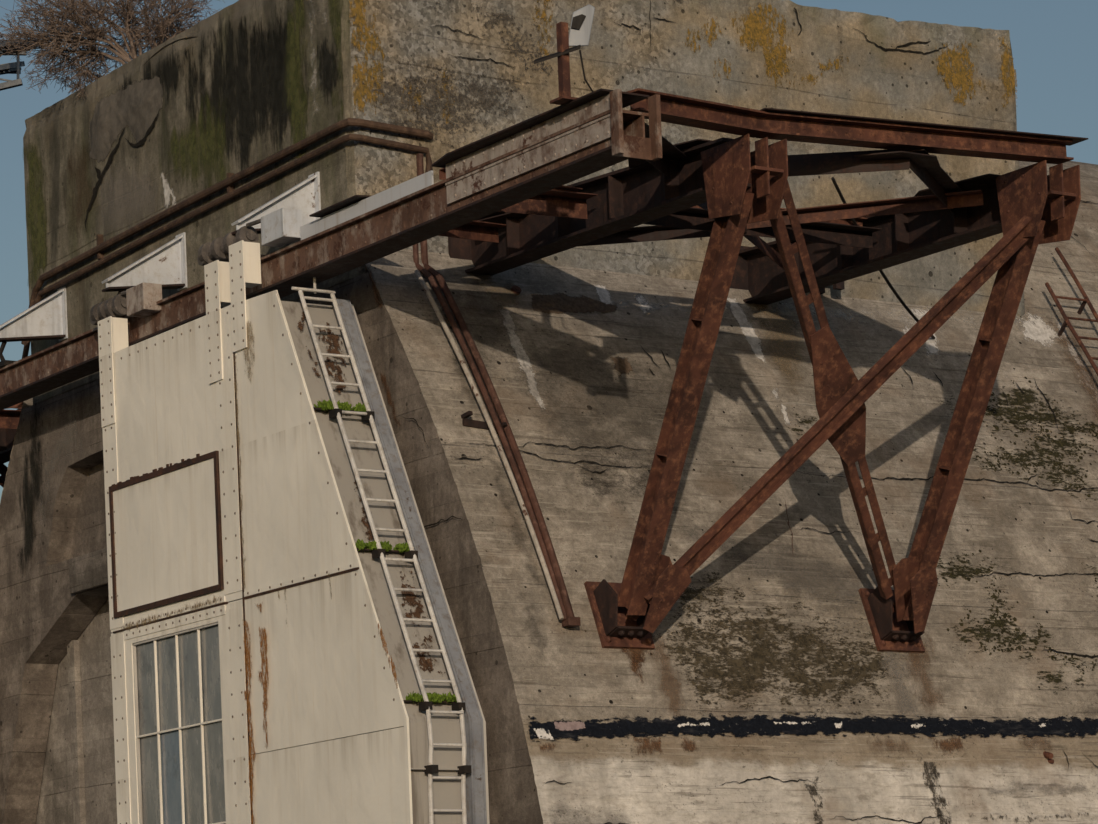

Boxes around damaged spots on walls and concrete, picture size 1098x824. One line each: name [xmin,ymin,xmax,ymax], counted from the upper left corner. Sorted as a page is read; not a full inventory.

water stain [122,0,343,171]
crack [856,29,947,54]
corrosion [234,321,254,589]
corrosion [244,621,268,824]
crack [716,776,820,785]
crack [838,815,946,824]